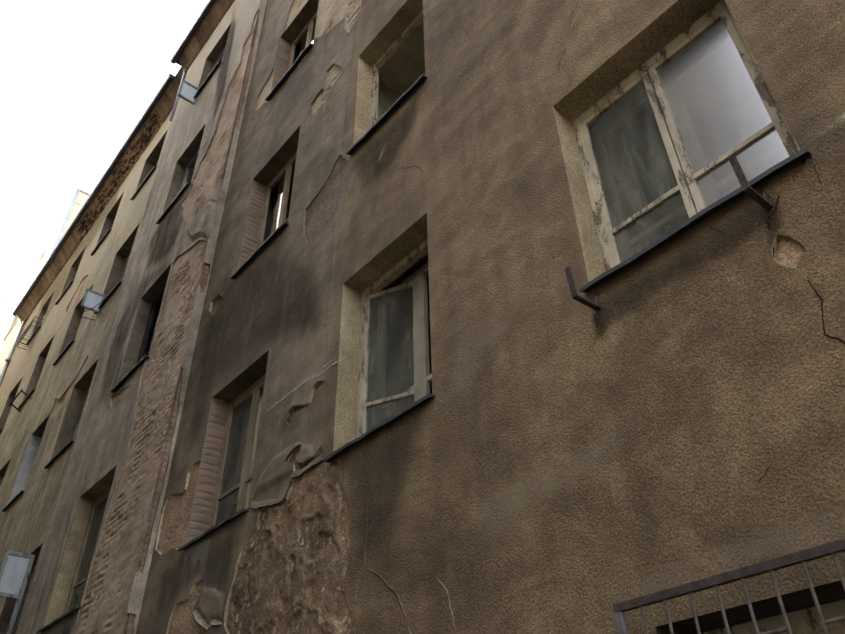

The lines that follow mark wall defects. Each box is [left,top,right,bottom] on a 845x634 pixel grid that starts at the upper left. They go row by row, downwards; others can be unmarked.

flaking render [315,0,362,39]
flaking render [181,9,260,221]
flaking render [253,0,308,113]
flaking render [310,62,348,116]
flaking render [771,234,807,268]
crack [807,280,845,345]
flaking render [283,381,324,424]
flaking render [72,240,210,634]
flaking render [166,445,351,634]